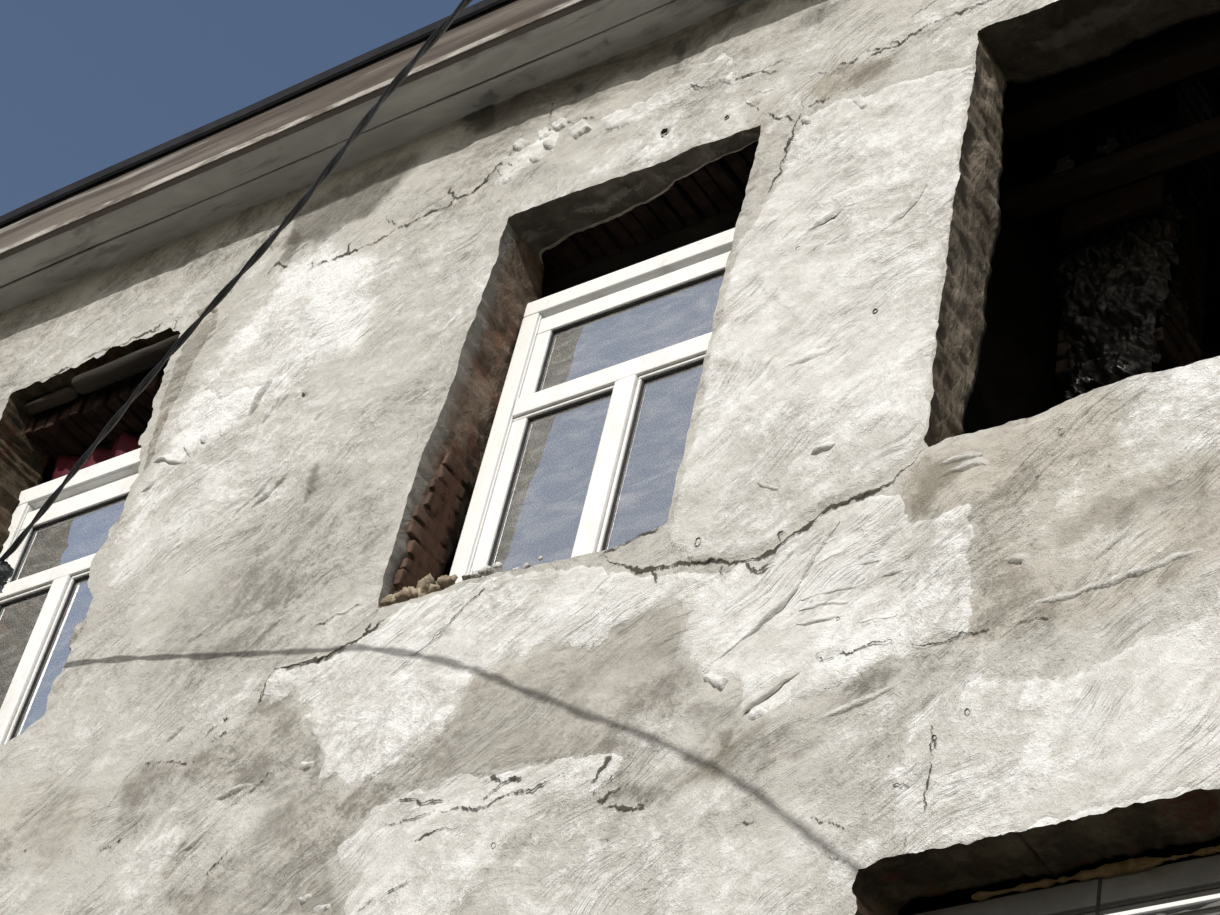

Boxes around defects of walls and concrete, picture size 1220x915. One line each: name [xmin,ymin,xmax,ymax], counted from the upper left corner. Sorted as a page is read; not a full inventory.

crack [689,0,989,192]
crack [264,153,539,276]
crack [599,444,926,580]
crack [815,616,1048,660]
crack [385,754,647,841]
crack [893,725,937,844]